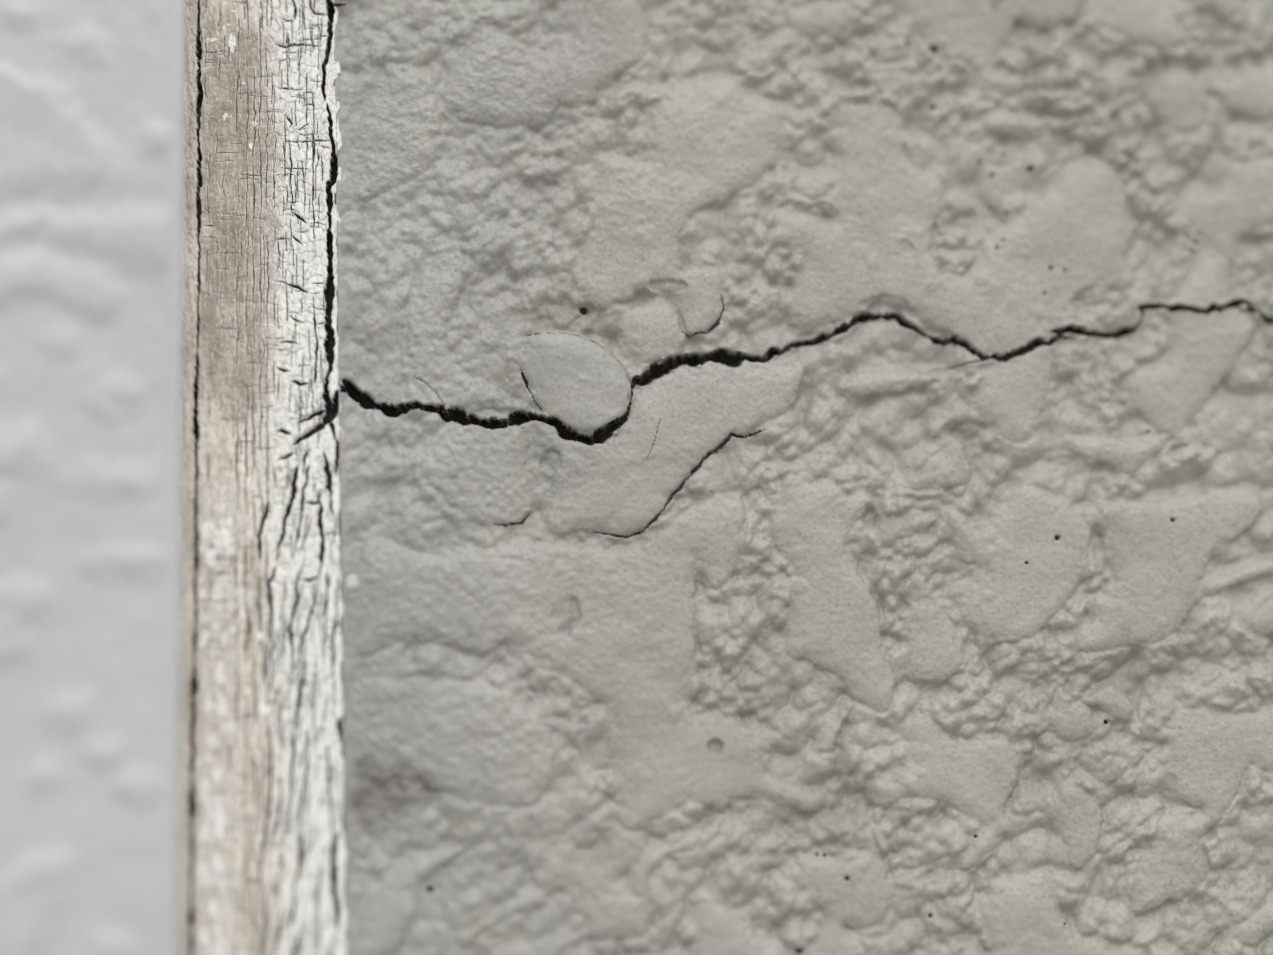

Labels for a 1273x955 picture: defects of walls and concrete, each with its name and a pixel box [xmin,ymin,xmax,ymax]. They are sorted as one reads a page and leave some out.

crack [208,137,237,176]
crack [216,264,248,373]
crack [187,0,230,955]
crack [223,0,344,955]
crack [493,512,530,527]
crack [594,429,765,538]
crack [207,537,257,761]